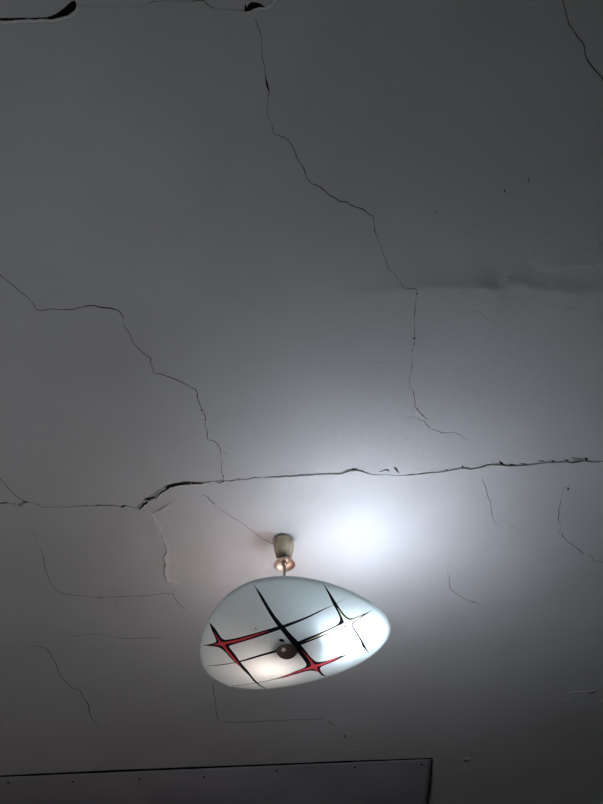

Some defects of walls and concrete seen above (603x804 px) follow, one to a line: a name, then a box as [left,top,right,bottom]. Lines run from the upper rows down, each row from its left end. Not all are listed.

flaking render [0,0,89,42]
flaking render [244,0,302,31]
crack [562,0,603,79]
crack [110,0,465,439]
crack [0,275,603,563]
flaking render [137,479,225,593]